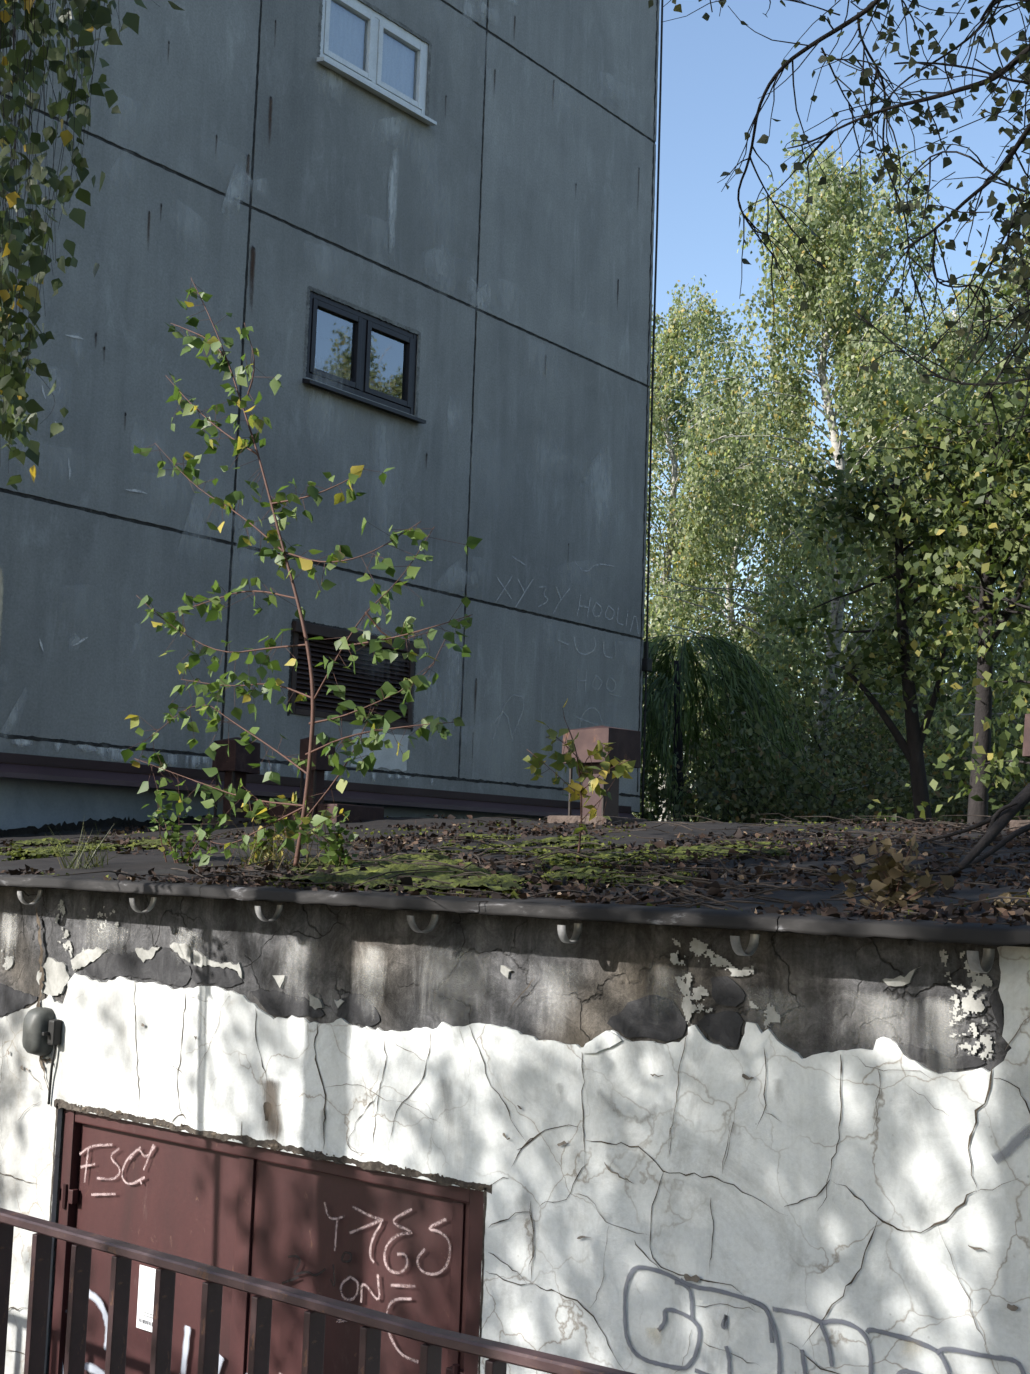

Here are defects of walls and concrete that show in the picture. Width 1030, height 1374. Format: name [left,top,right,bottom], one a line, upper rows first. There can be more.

crack [0,1035,51,1185]
crack [132,981,140,1109]
crack [172,996,267,1122]
peeling [0,886,1011,1074]
crack [314,1017,1030,1374]